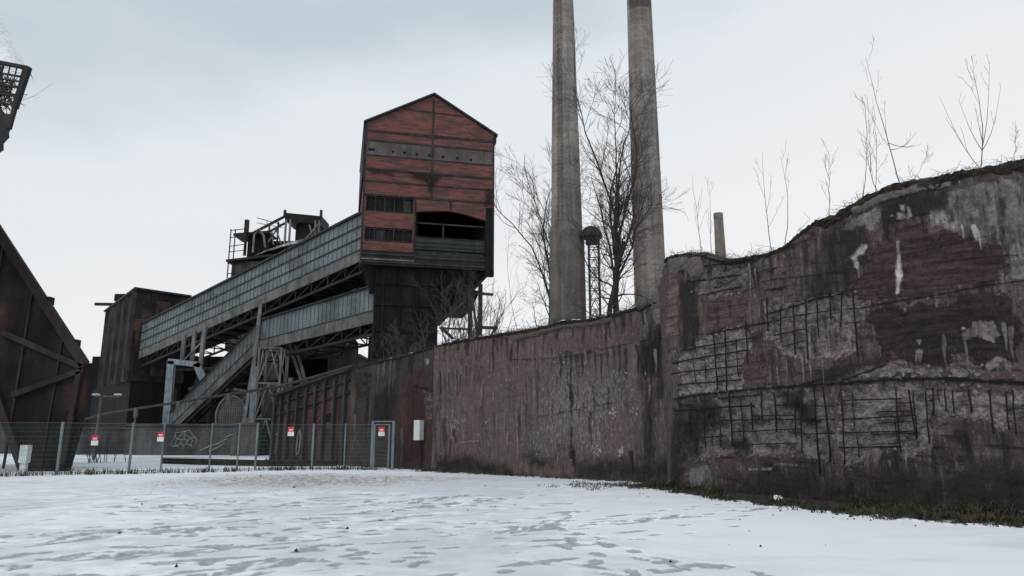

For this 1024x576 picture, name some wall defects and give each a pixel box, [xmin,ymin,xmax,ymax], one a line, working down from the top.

water stain [543,310,718,487]
spalling [641,178,1024,486]
water stain [802,228,867,299]
water stain [881,190,981,293]